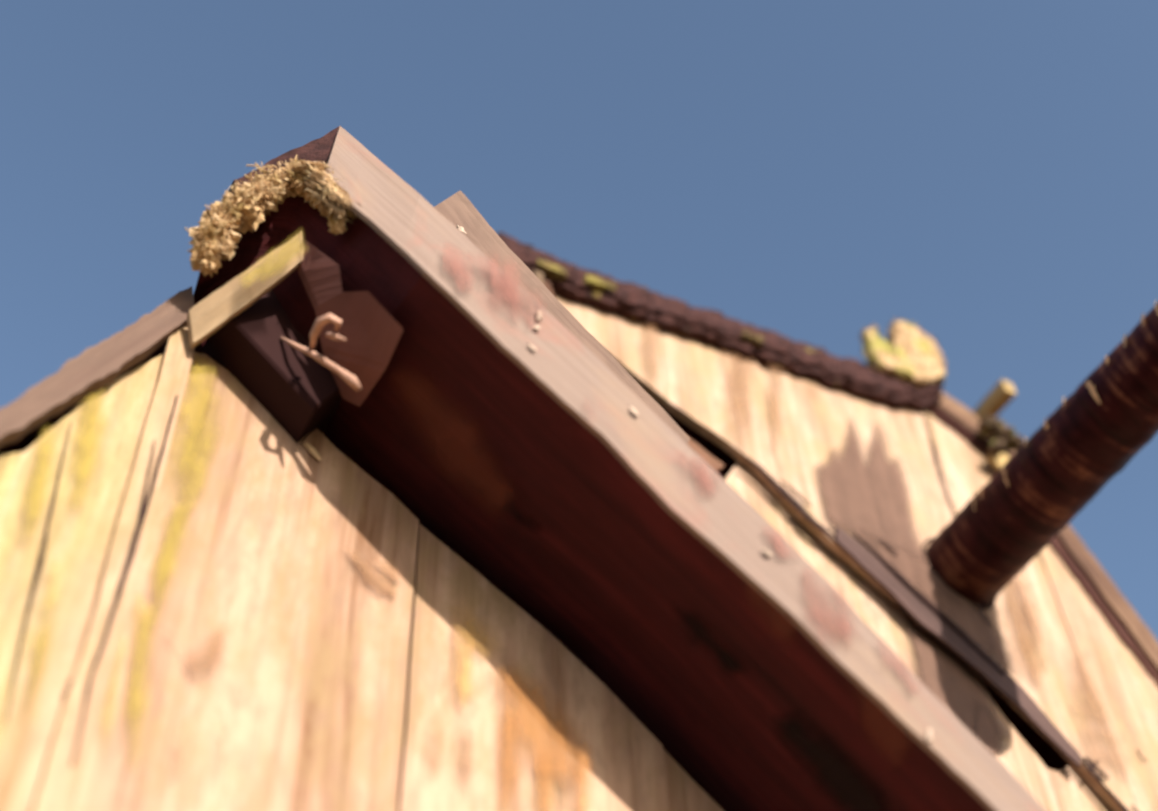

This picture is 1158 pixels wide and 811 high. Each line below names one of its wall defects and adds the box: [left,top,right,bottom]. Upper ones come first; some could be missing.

crack [71,395,178,765]